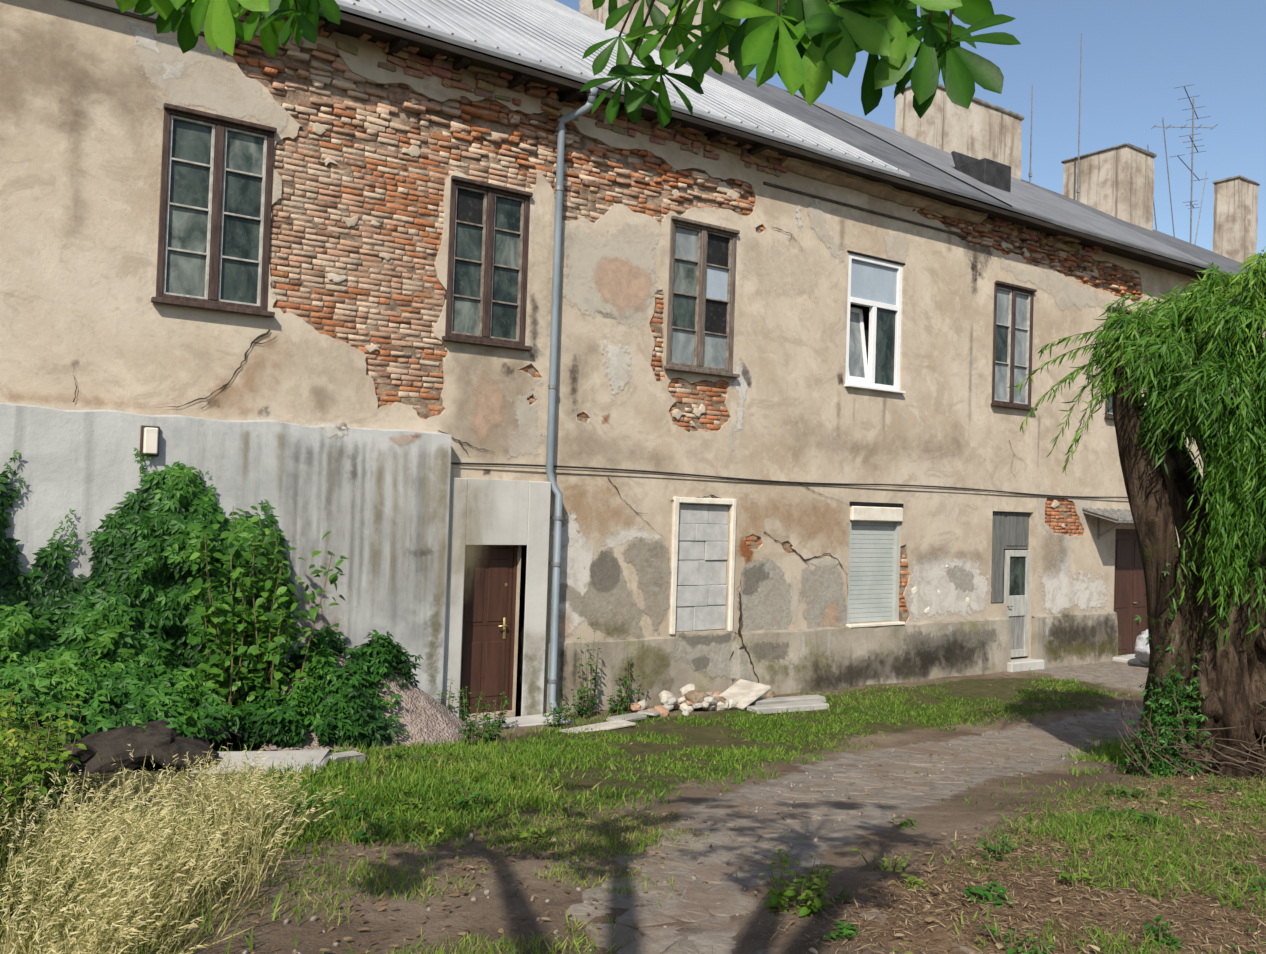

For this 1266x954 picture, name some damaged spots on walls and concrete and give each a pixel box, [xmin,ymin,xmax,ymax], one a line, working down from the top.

flaking render [130,23,765,432]
flaking render [916,209,1143,304]
crack [157,329,277,409]
flaking render [550,513,660,639]
crack [729,572,759,683]
leakage [753,641,788,672]
crack [764,532,848,594]
leakage [810,553,996,692]
flaking render [899,545,909,623]
flaking render [1038,490,1107,614]
leakage [1047,617,1116,655]